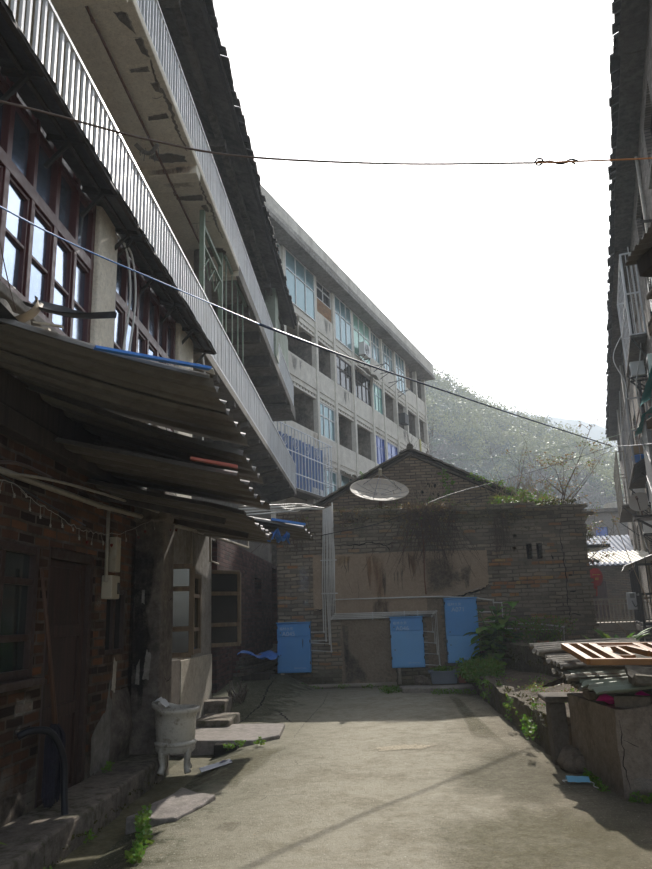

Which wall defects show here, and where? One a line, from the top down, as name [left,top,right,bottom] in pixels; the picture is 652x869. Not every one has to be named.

spalling [113,11,187,163]